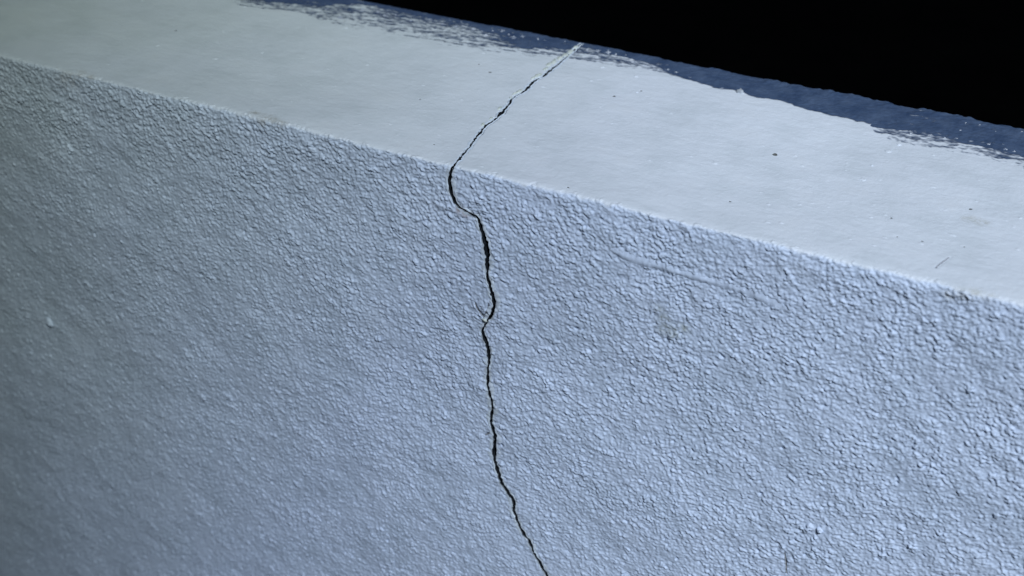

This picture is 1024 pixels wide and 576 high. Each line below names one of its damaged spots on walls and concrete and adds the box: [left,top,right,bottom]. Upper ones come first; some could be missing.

crack [444,43,583,576]